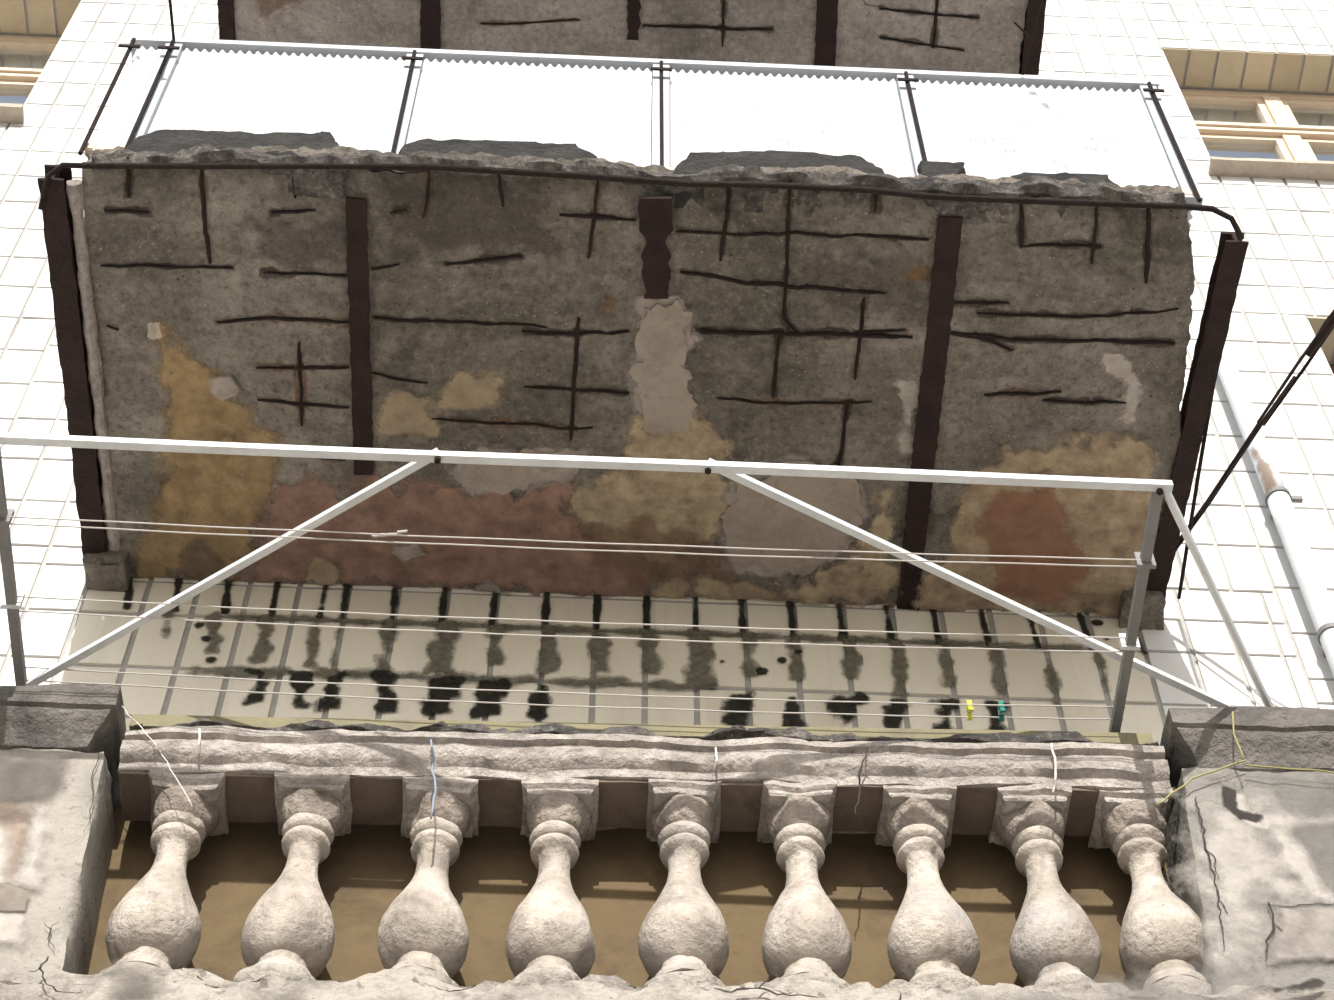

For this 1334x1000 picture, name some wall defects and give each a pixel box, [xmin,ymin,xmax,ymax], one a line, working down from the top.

spalling [480,18,580,26]
spalling [643,0,774,47]
spalling [879,0,980,51]
peeling [38,143,1245,618]
water stain [979,487,1089,604]
water stain [123,577,134,610]
water stain [162,578,183,637]
water stain [189,517,1109,730]
crack [1195,796,1228,950]
crack [29,922,81,993]
crack [1261,902,1332,960]